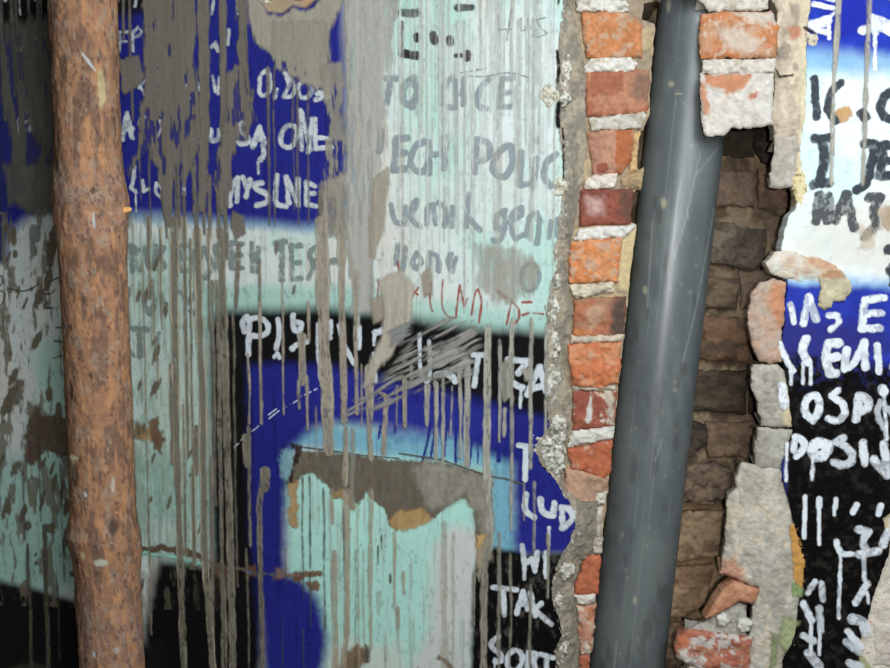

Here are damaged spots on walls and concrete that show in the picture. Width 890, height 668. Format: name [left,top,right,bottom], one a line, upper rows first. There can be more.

spalling [767,0,819,207]
leakage [861,206,890,246]
spalling [531,0,661,668]
peeling [281,443,494,578]
spalling [717,278,805,668]
spalling [859,550,890,668]